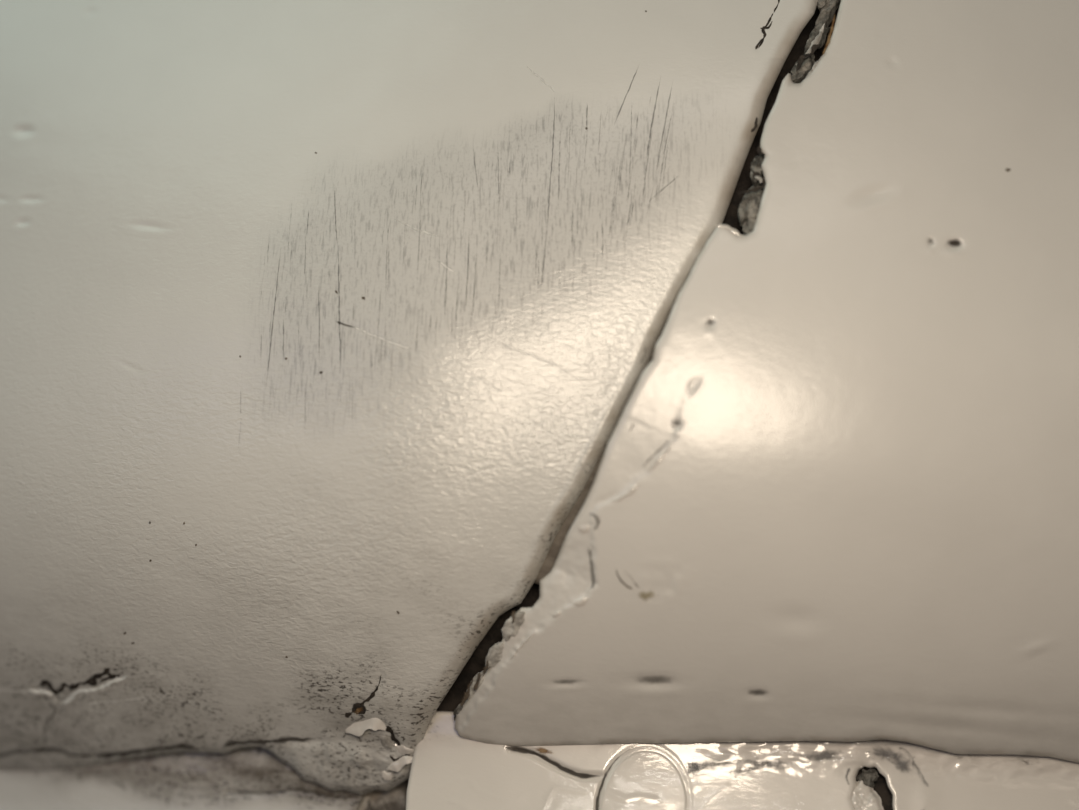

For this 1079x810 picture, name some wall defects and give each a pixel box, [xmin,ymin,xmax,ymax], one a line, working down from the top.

crack [755,0,780,49]
spalling [453,610,535,720]
spalling [345,676,414,781]
spalling [856,767,893,810]